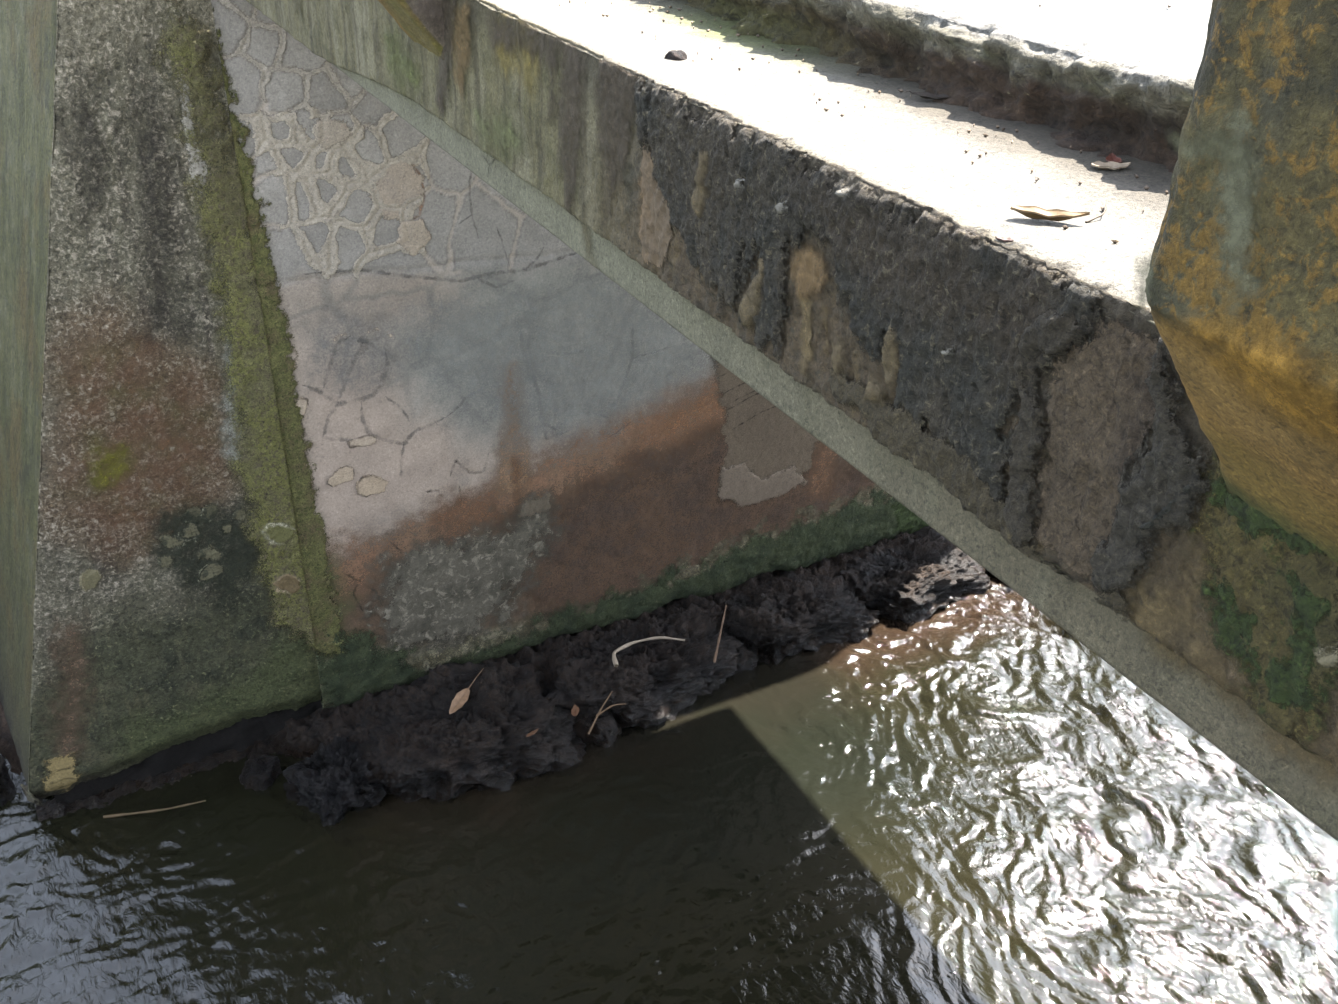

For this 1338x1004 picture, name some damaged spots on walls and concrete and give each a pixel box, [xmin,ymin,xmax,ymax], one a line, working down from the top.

damp [140,126,174,266]
damp [179,74,209,196]
crack [320,247,576,288]
peeling [637,144,673,268]
damp [152,499,263,602]
damp [222,337,247,461]
crack [307,338,482,473]
corrosion [324,379,727,603]
damp [402,431,892,672]
peeling [710,357,820,507]
spalling [1033,318,1166,583]